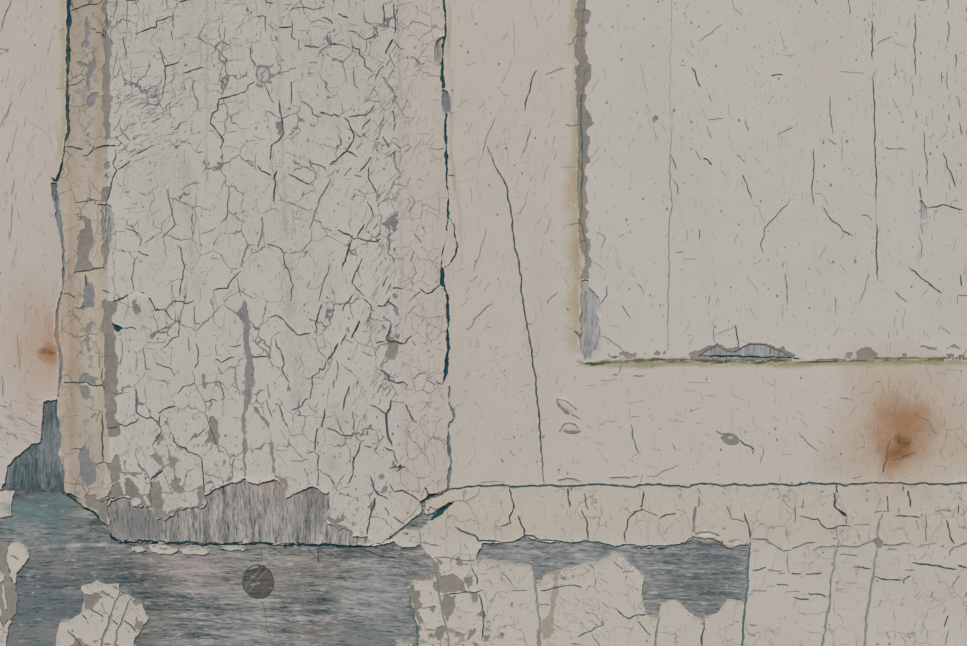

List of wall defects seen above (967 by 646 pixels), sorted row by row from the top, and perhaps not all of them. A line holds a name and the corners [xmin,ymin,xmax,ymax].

spalling [77,0,114,141]
spalling [75,161,123,437]
crack [0,0,742,646]
peeling [0,293,749,646]
peeling [574,0,601,359]
peeling [689,343,795,364]
crack [629,0,967,351]
spalling [845,347,878,360]
spalling [920,344,965,358]